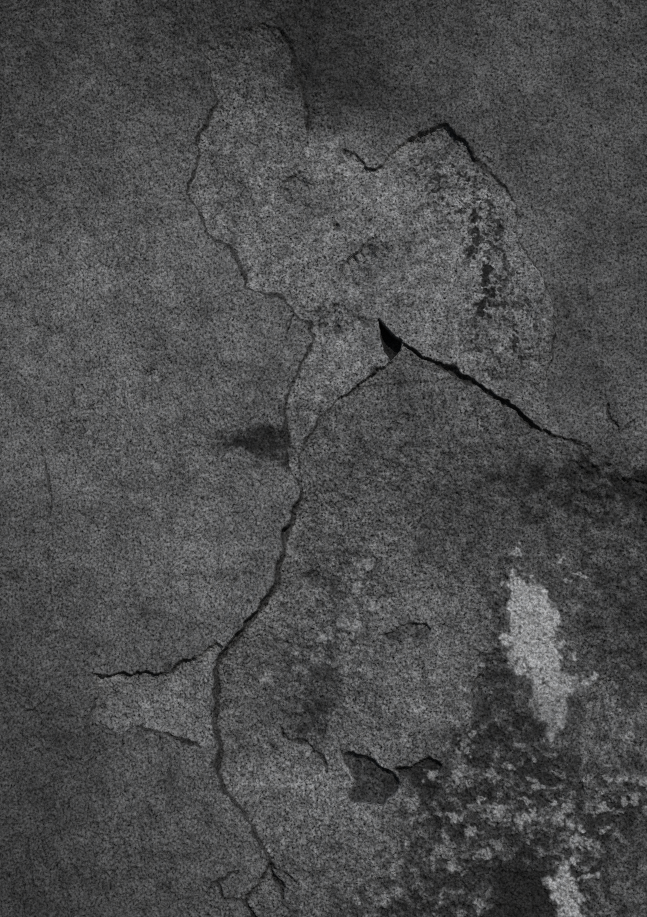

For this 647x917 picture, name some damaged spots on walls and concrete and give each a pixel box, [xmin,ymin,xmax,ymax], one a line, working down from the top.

crack [273,25,312,134]
crack [442,123,553,303]
crack [89,48,385,917]
spalling [189,20,647,917]
crack [402,342,594,450]
crack [546,325,557,370]
crack [605,402,636,432]
crack [613,470,647,487]
spalling [82,639,230,849]
leakage [258,430,647,917]